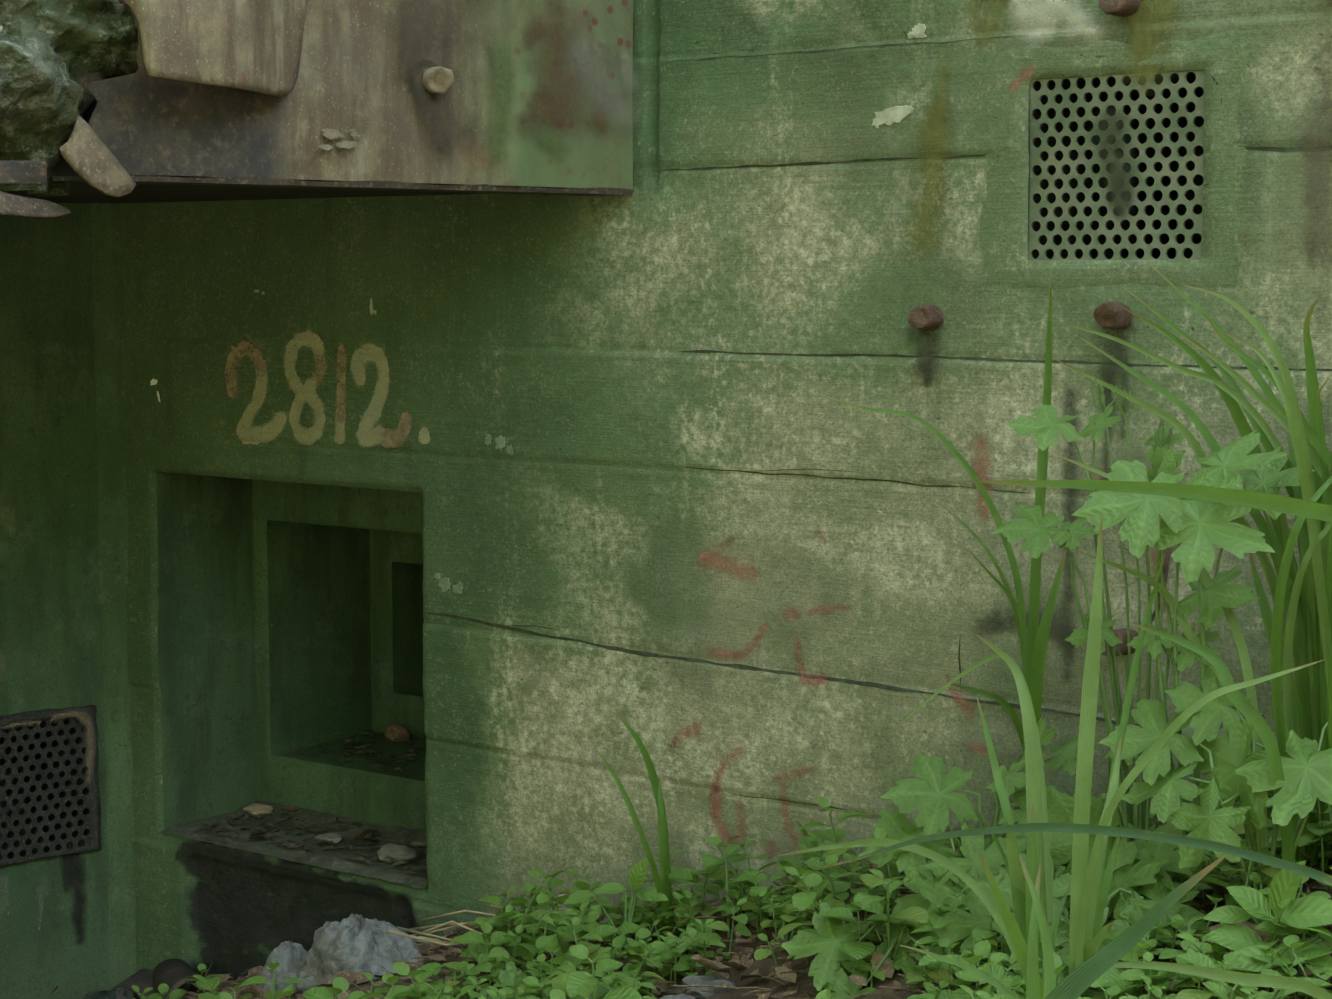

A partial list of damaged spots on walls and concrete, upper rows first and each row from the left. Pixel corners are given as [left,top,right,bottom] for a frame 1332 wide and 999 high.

peeling [872,105,914,128]
water stain [63,842,85,943]
water stain [394,895,412,935]